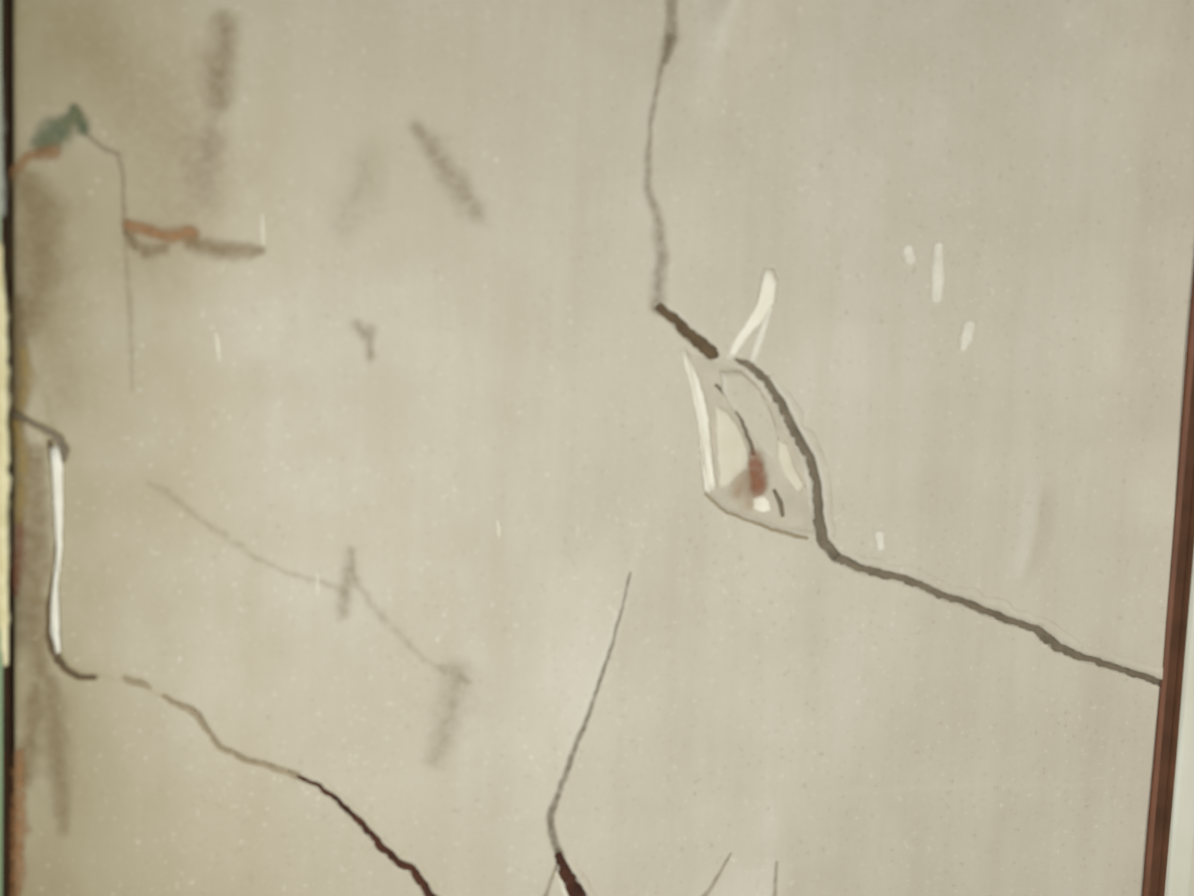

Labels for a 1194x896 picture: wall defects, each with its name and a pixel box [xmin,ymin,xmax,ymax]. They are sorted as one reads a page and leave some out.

corrosion [124,221,232,253]
crack [10,409,452,896]
crack [549,575,630,896]
flaking render [683,269,813,540]
crack [655,303,1163,685]